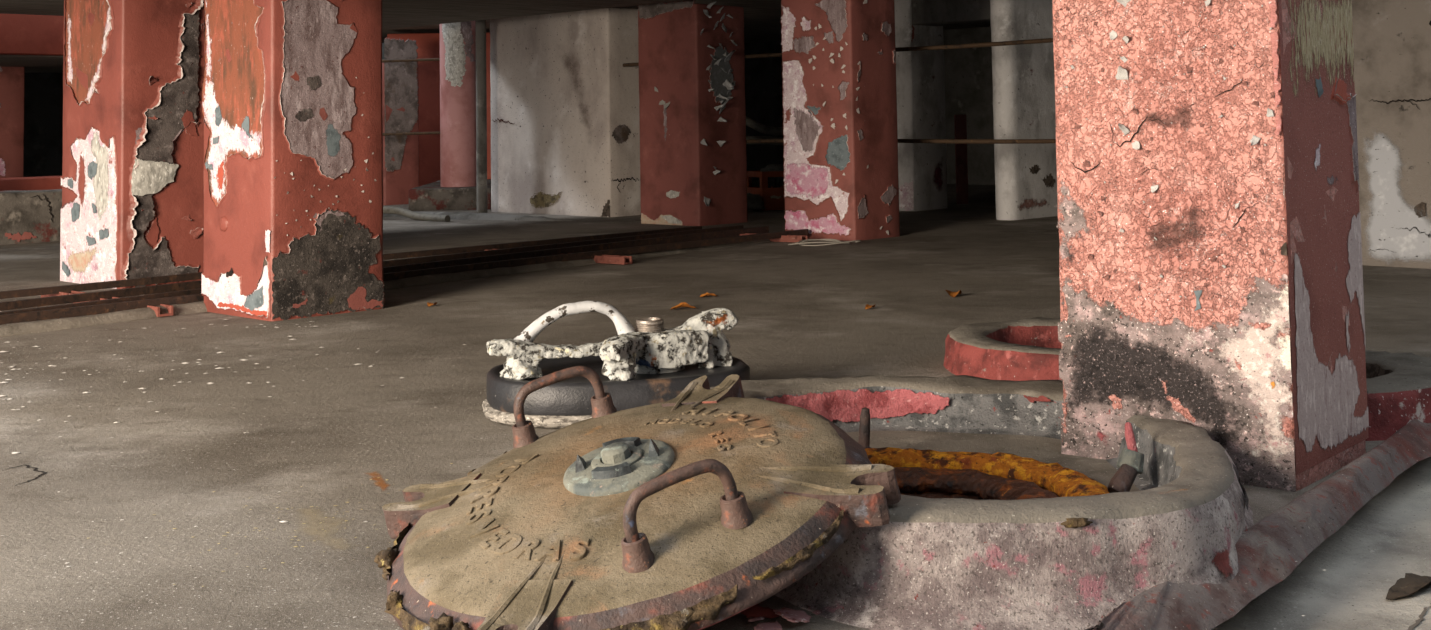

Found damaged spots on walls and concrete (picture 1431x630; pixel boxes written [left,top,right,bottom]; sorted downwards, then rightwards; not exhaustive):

peeling [60,0,419,320]
peeling [781,0,914,237]
peeling [1029,165,1090,259]
peeling [1282,0,1360,194]
damp [1067,284,1292,510]
peeling [1023,212,1369,492]
crack [1407,603,1431,630]